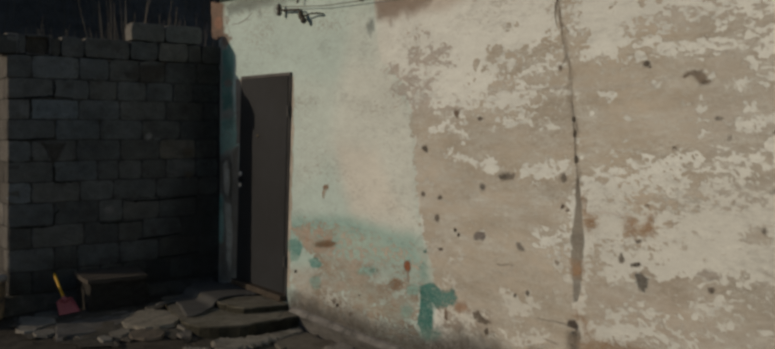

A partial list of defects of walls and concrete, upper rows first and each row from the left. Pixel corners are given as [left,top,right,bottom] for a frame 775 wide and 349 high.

crack [554,0,583,189]
peeling [381,0,775,349]
peeling [288,213,358,291]
corrosion [387,261,412,291]
damp [287,285,544,349]